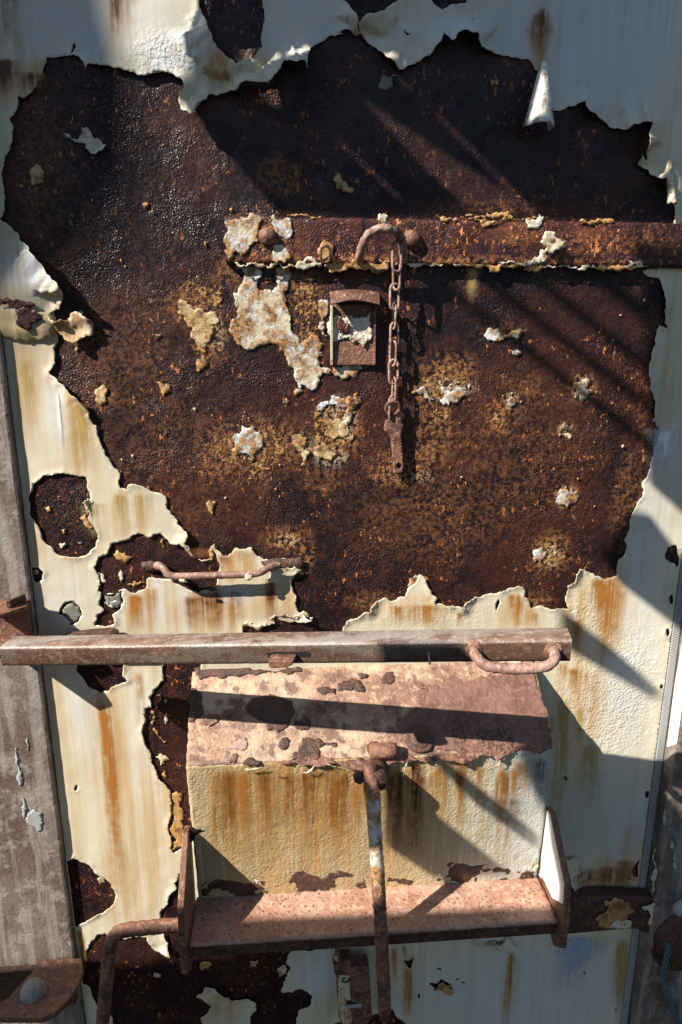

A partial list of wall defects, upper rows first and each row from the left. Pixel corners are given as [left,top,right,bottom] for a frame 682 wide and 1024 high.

rust [0,297,41,330]
peeling [0,0,677,633]
rust [129,590,154,618]
rust [593,580,621,632]
rust [99,705,120,856]
peeling [142,664,371,853]
rust [212,768,365,838]
rust [387,762,482,831]
peeling [68,858,116,927]
peeling [160,875,180,918]
peeling [82,934,107,1004]
peeling [110,933,312,1024]